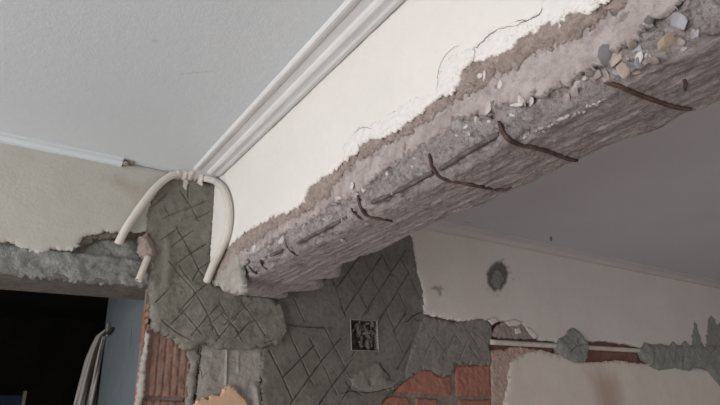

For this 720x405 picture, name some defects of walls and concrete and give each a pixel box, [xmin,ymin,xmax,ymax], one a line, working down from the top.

crack [437,8,542,84]
spalling [242,0,720,299]
flaking render [141,304,190,405]
flaking render [382,363,491,405]
peeling [488,317,538,340]